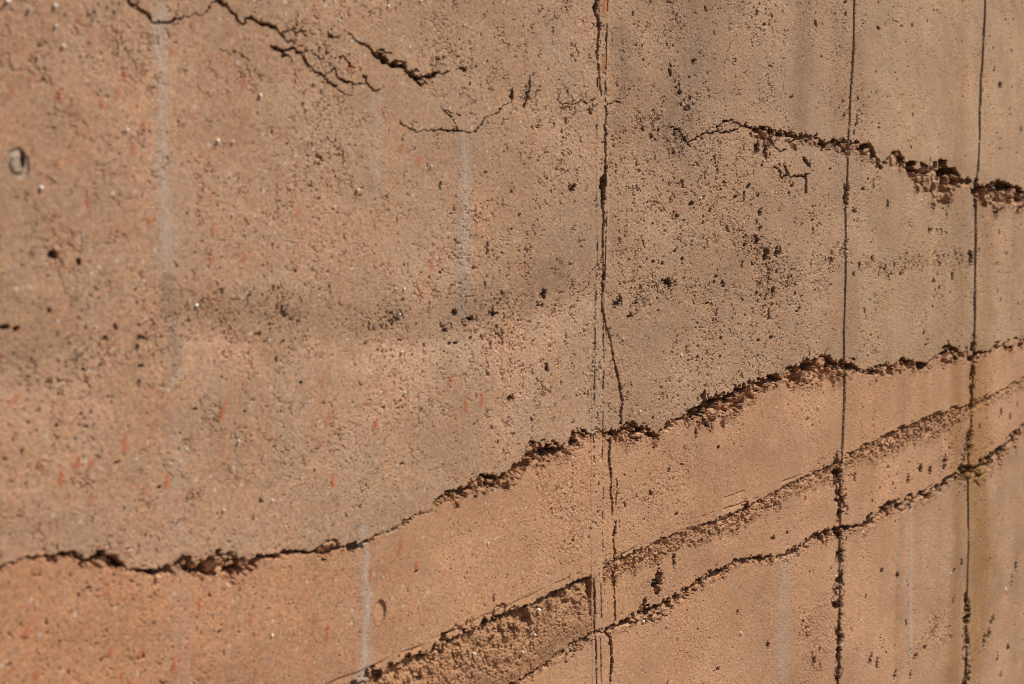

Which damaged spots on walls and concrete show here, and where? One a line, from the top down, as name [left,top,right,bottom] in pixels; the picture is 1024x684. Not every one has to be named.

crack [215,0,446,91]
crack [673,119,805,193]
crack [430,337,1024,511]
crack [0,540,360,586]
crack [509,425,1024,684]
spalling [349,576,592,684]